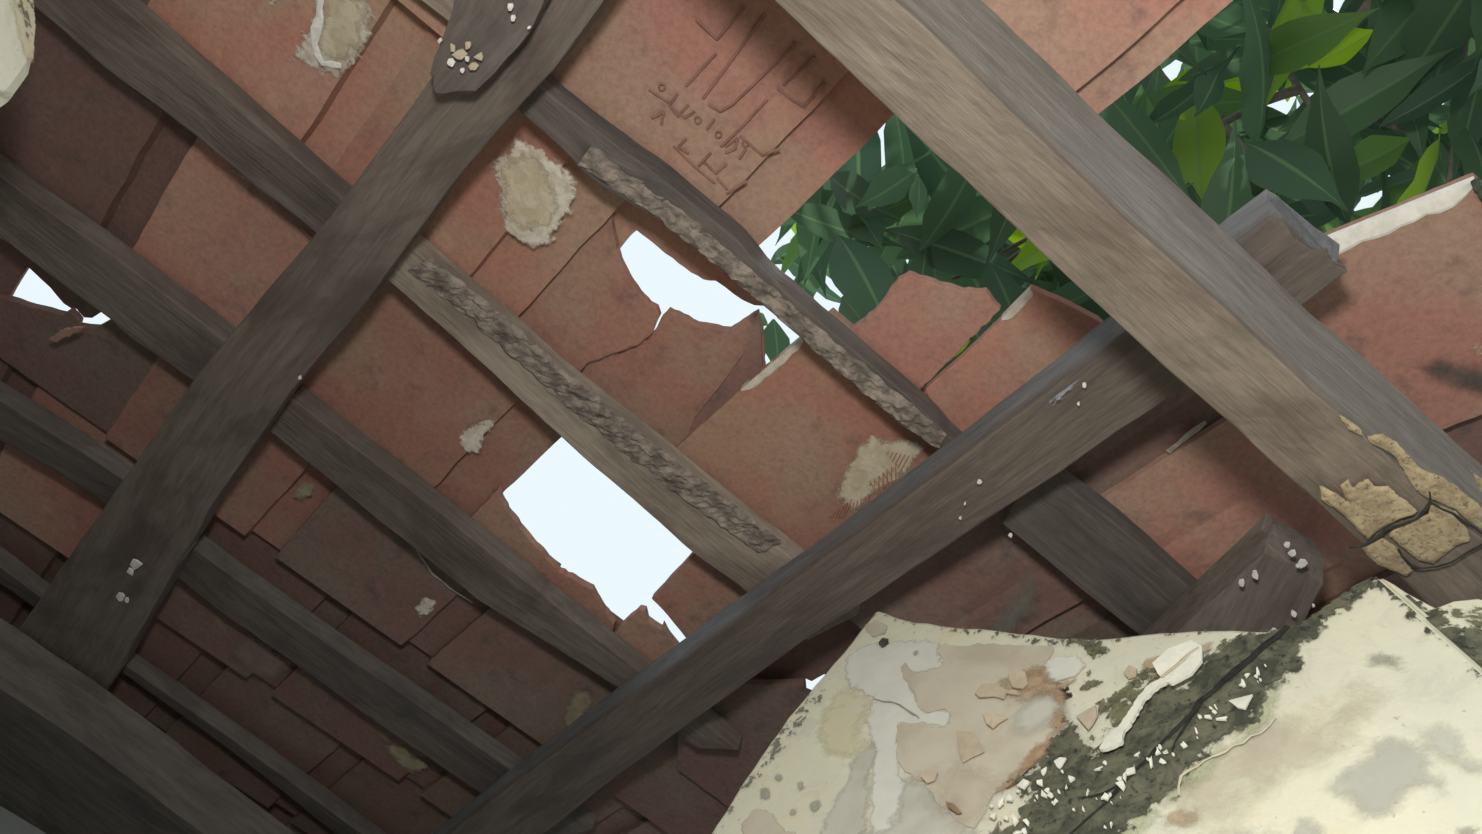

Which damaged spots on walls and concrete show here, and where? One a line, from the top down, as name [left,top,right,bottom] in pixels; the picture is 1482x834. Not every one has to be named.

peeling [896,640,1203,829]
leakage [760,577,1482,834]
crack [1069,625,1290,834]